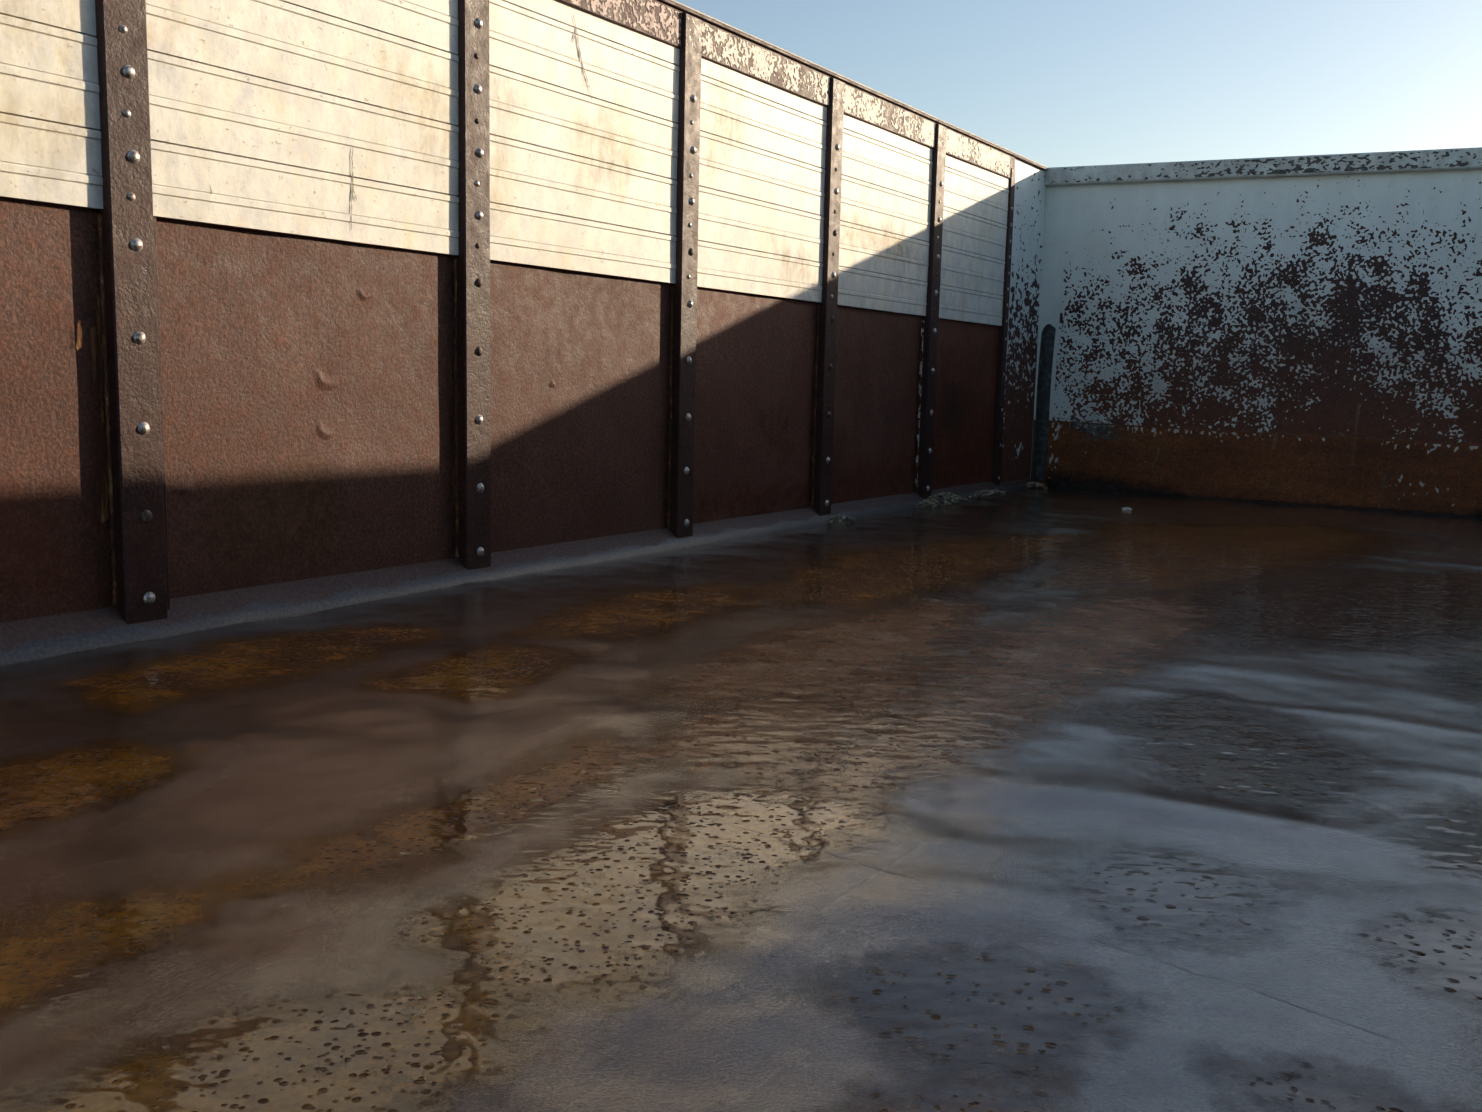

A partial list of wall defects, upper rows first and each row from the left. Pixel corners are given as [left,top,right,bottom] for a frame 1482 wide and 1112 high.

peeling [571,0,1482,506]